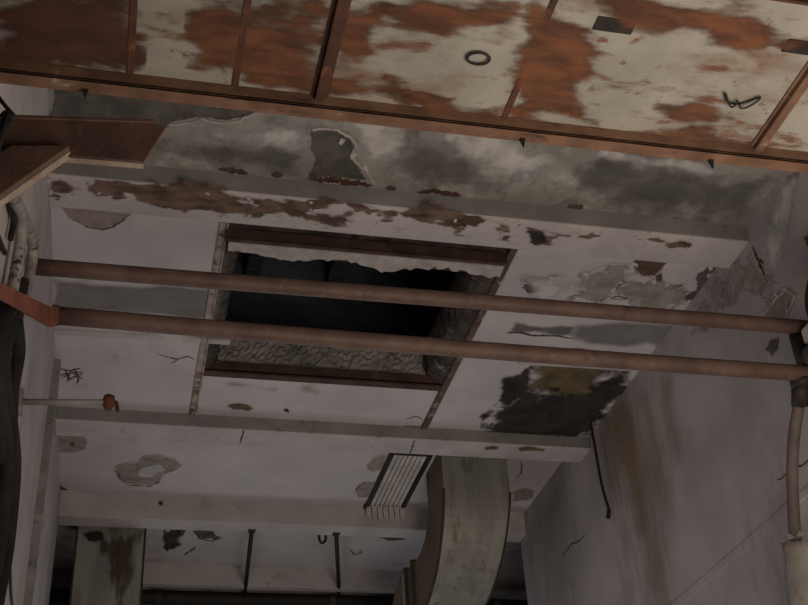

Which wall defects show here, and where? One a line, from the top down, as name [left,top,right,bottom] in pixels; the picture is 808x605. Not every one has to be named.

rust [185,0,331,92]
rust [329,1,598,120]
rust [600,0,804,51]
damp [203,125,306,169]
flaking render [309,127,375,184]
damp [352,123,406,166]
damp [409,133,551,183]
damp [579,150,754,209]
rust [635,104,751,144]
peeling [47,179,486,236]
peeling [568,260,717,309]
flaking render [114,454,182,487]